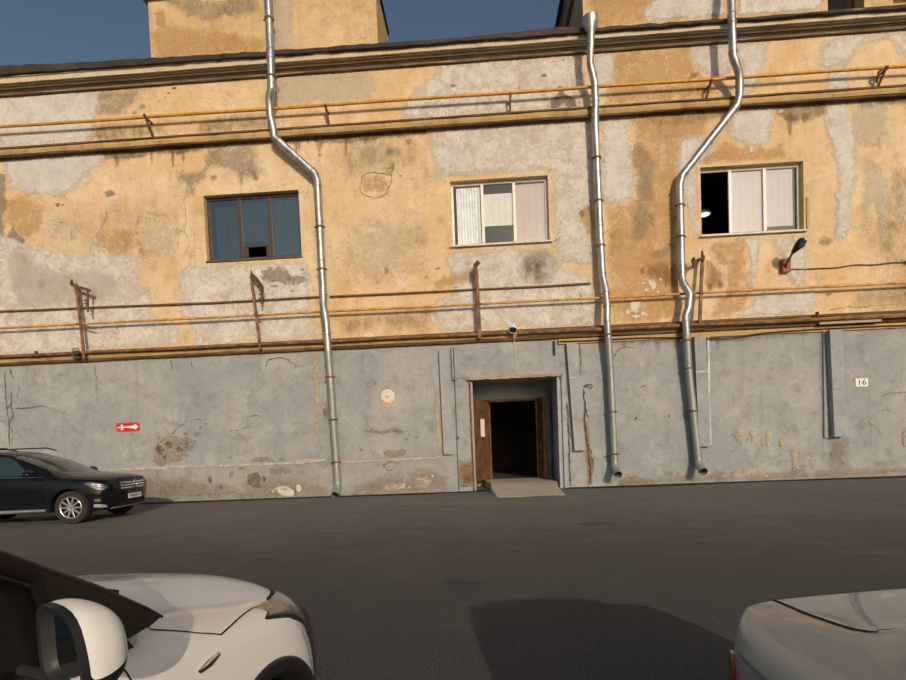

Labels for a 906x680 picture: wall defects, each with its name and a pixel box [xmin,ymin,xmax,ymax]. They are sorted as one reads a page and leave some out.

flaking render [0,174,24,245]
crack [71,177,192,258]
crack [359,162,393,198]
crack [4,370,68,446]
peeling [100,356,327,497]